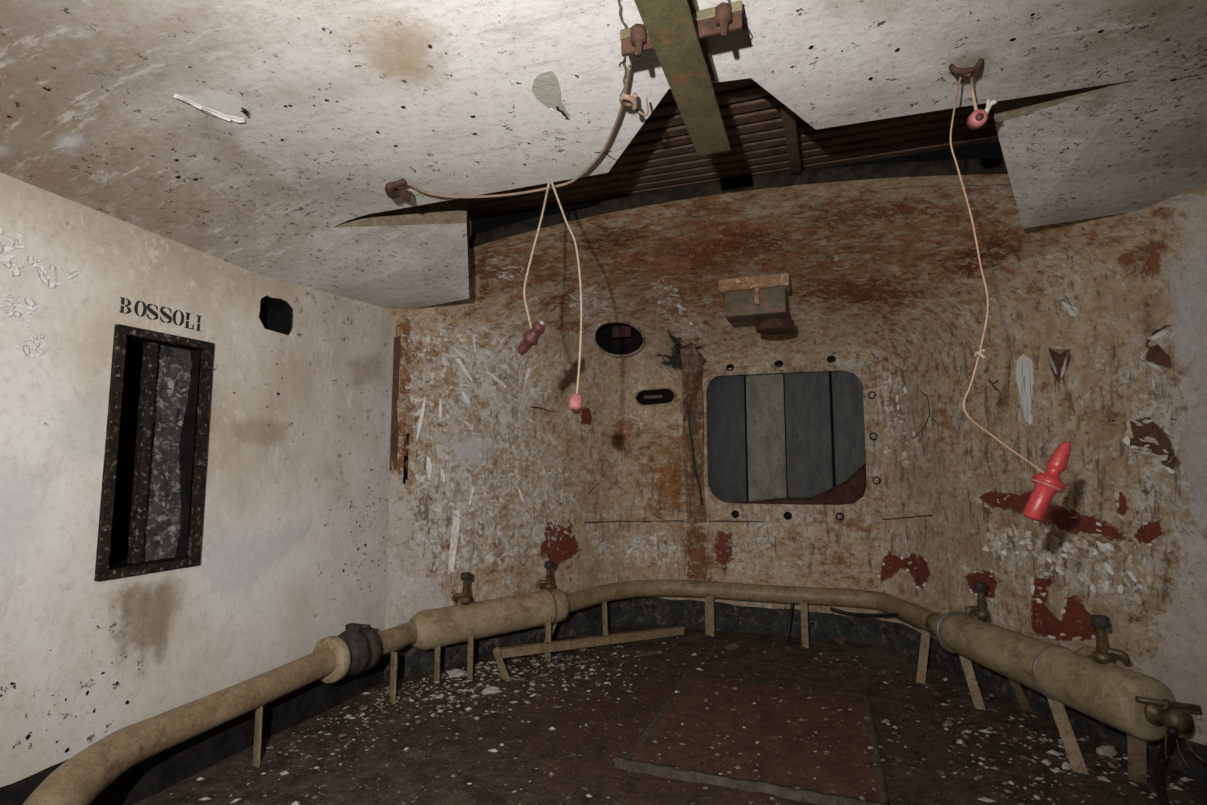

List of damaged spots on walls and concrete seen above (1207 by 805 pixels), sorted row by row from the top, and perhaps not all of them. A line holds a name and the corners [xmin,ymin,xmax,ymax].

peeling [170,90,251,123]
rust [560,225,647,258]
rust [676,195,953,277]
rust [792,230,1023,309]
peeling [1015,354,1034,426]
peeling [1048,346,1071,382]
spalling [1140,325,1172,400]
peeling [389,325,679,578]
peeling [1122,415,1180,474]
peeling [712,530,736,575]
peeling [877,546,931,591]
peeling [964,487,1163,641]